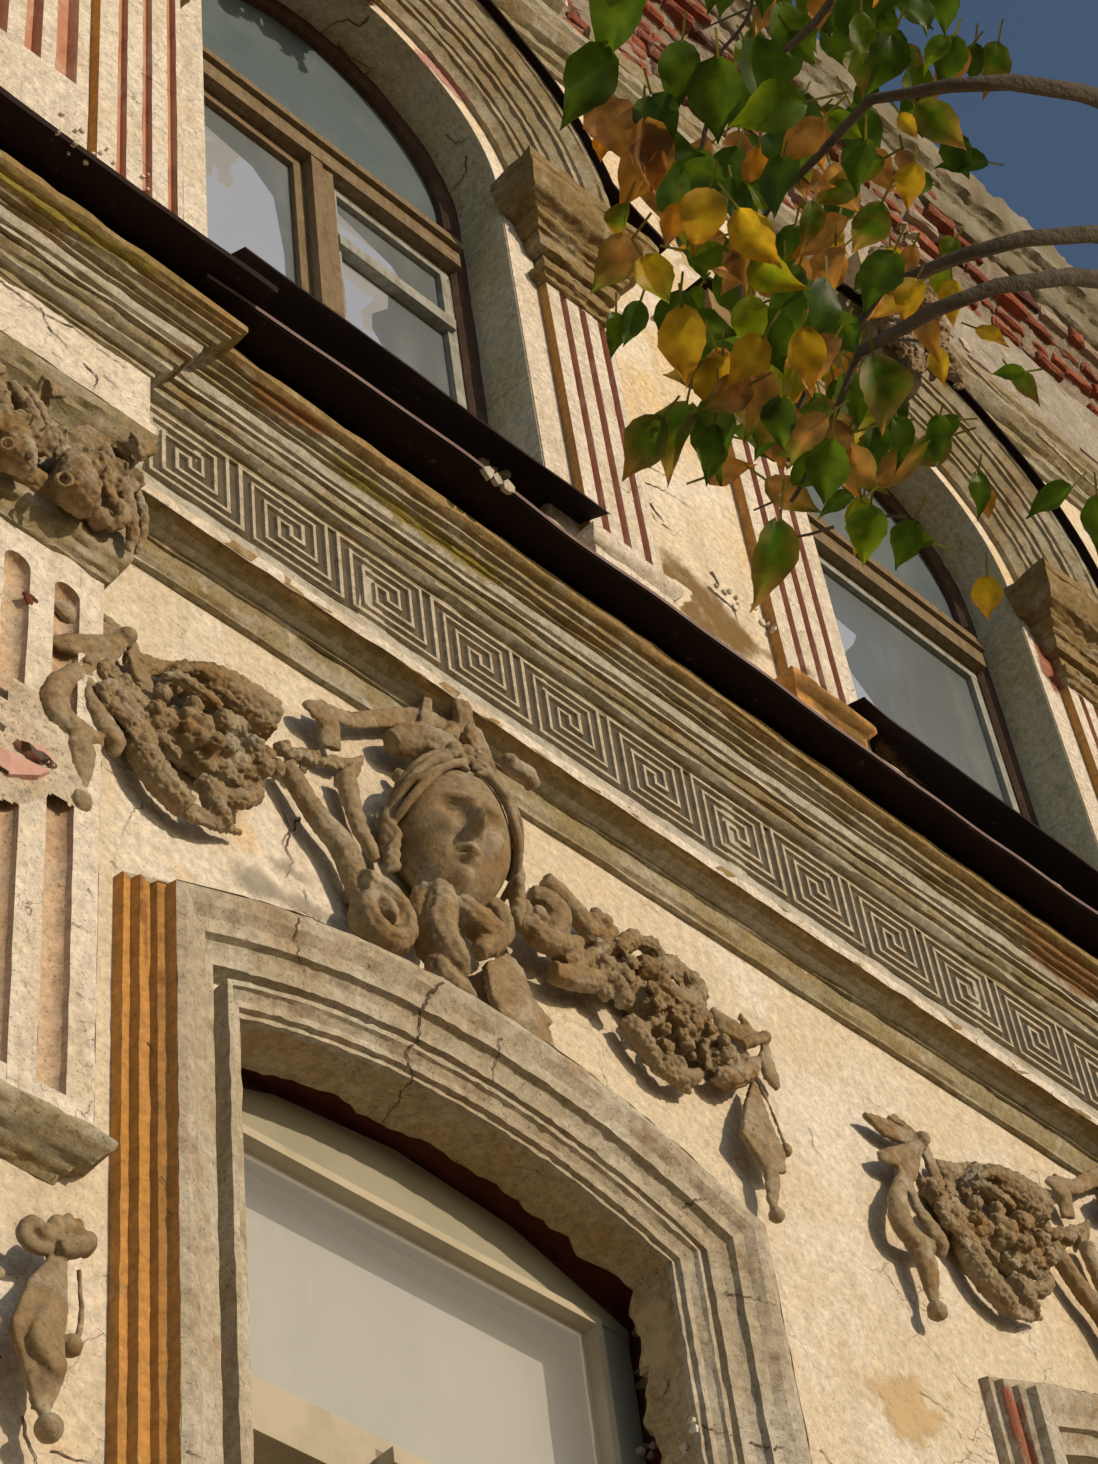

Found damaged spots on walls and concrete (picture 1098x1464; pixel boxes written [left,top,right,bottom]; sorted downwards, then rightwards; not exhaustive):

flaking render [562,0,589,37]
flaking render [618,0,740,90]
flaking render [828,139,847,162]
flaking render [782,187,824,213]
flaking render [852,176,1098,416]
spalling [950,334,1098,498]
spalling [22,591,38,605]
spalling [0,677,91,808]
crack [382,982,445,1131]
flaking render [679,1416,699,1458]